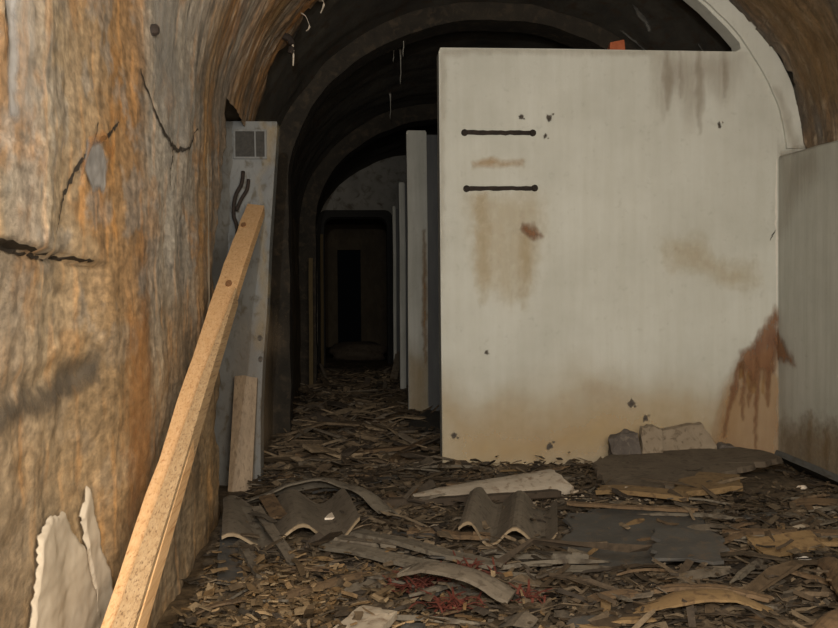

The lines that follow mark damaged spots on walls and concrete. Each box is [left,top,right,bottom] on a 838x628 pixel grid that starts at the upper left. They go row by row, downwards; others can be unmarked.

crack [0,238,94,263]
rust [522,225,538,239]
rust [716,311,792,454]
leakage [457,411,691,465]
peeling [29,485,113,628]